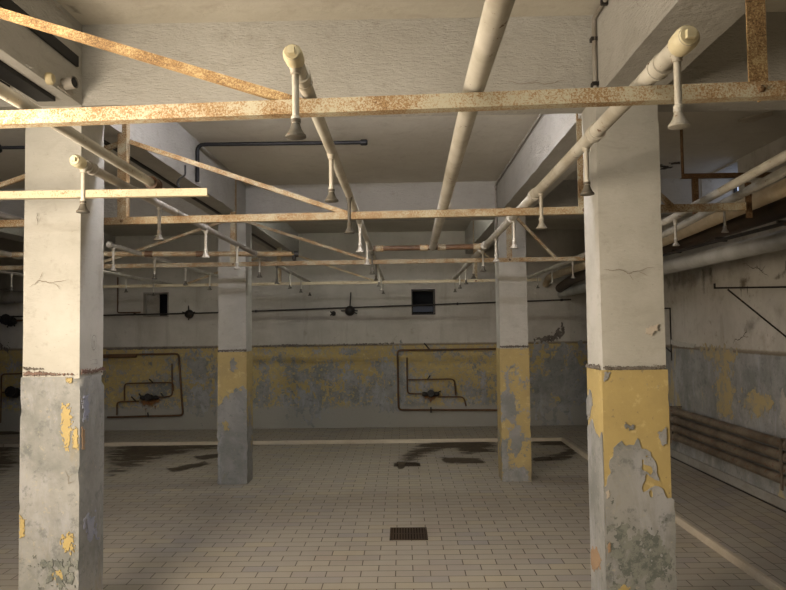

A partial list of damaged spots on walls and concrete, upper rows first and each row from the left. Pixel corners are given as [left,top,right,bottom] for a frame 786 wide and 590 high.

peeling [23,367,106,384]
peeling [59,394,90,452]
peeling [106,340,408,485]
peeling [699,343,786,430]
leakage [397,442,495,469]
peeling [500,322,677,590]
peeling [18,515,26,538]
peeling [28,530,78,590]